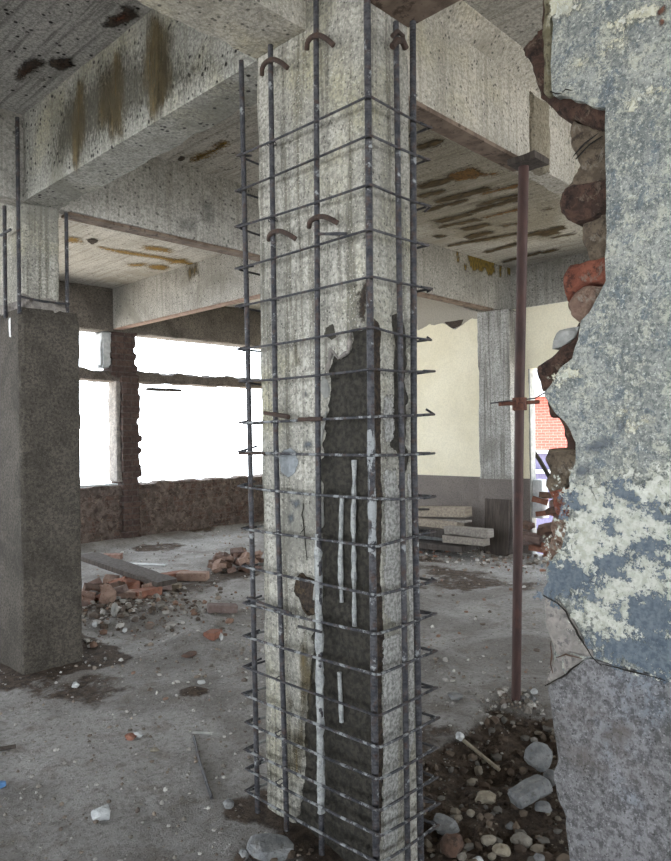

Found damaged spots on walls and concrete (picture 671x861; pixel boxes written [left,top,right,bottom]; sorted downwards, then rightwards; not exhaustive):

damp [48,18,211,171]
corrosion [99,245,193,271]
corrosion [190,140,238,161]
corrosion [416,139,444,150]
corrosion [417,167,576,263]
spalling [523,0,607,391]
peeling [417,296,478,330]
spalling [294,282,409,861]
crack [543,595,668,686]